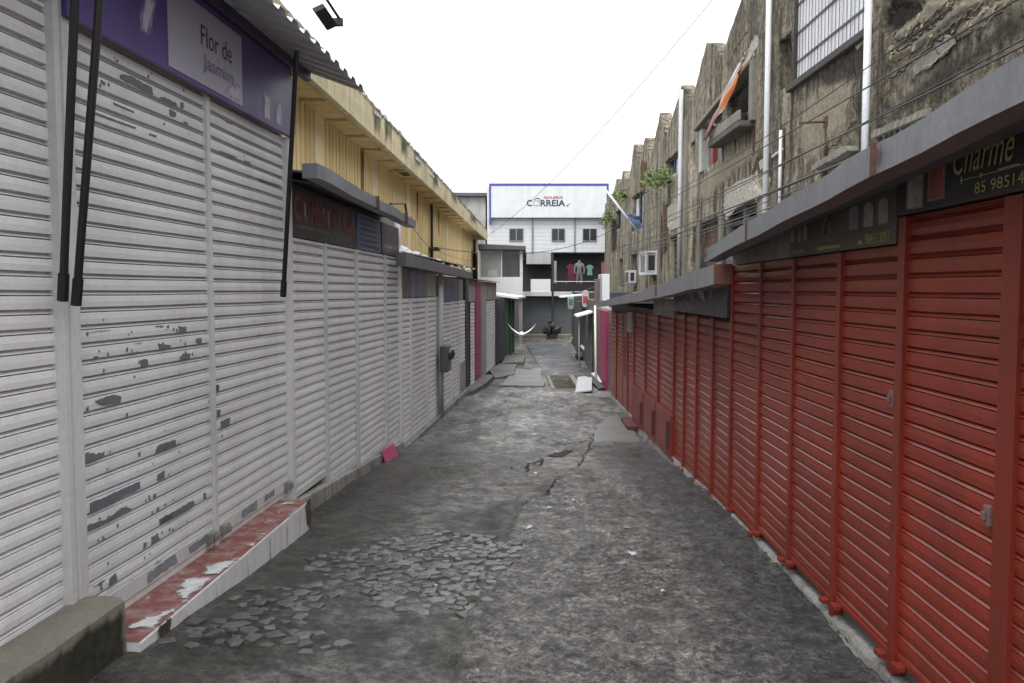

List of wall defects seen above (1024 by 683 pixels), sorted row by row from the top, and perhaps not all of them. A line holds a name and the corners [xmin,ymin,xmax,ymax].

flaking render [888,0,1011,62]
peeling [95,57,189,137]
peeling [157,325,202,359]
peeling [86,395,128,417]
peeling [209,384,230,437]
peeling [85,430,206,565]
spalling [249,498,311,546]
peeling [129,558,240,638]